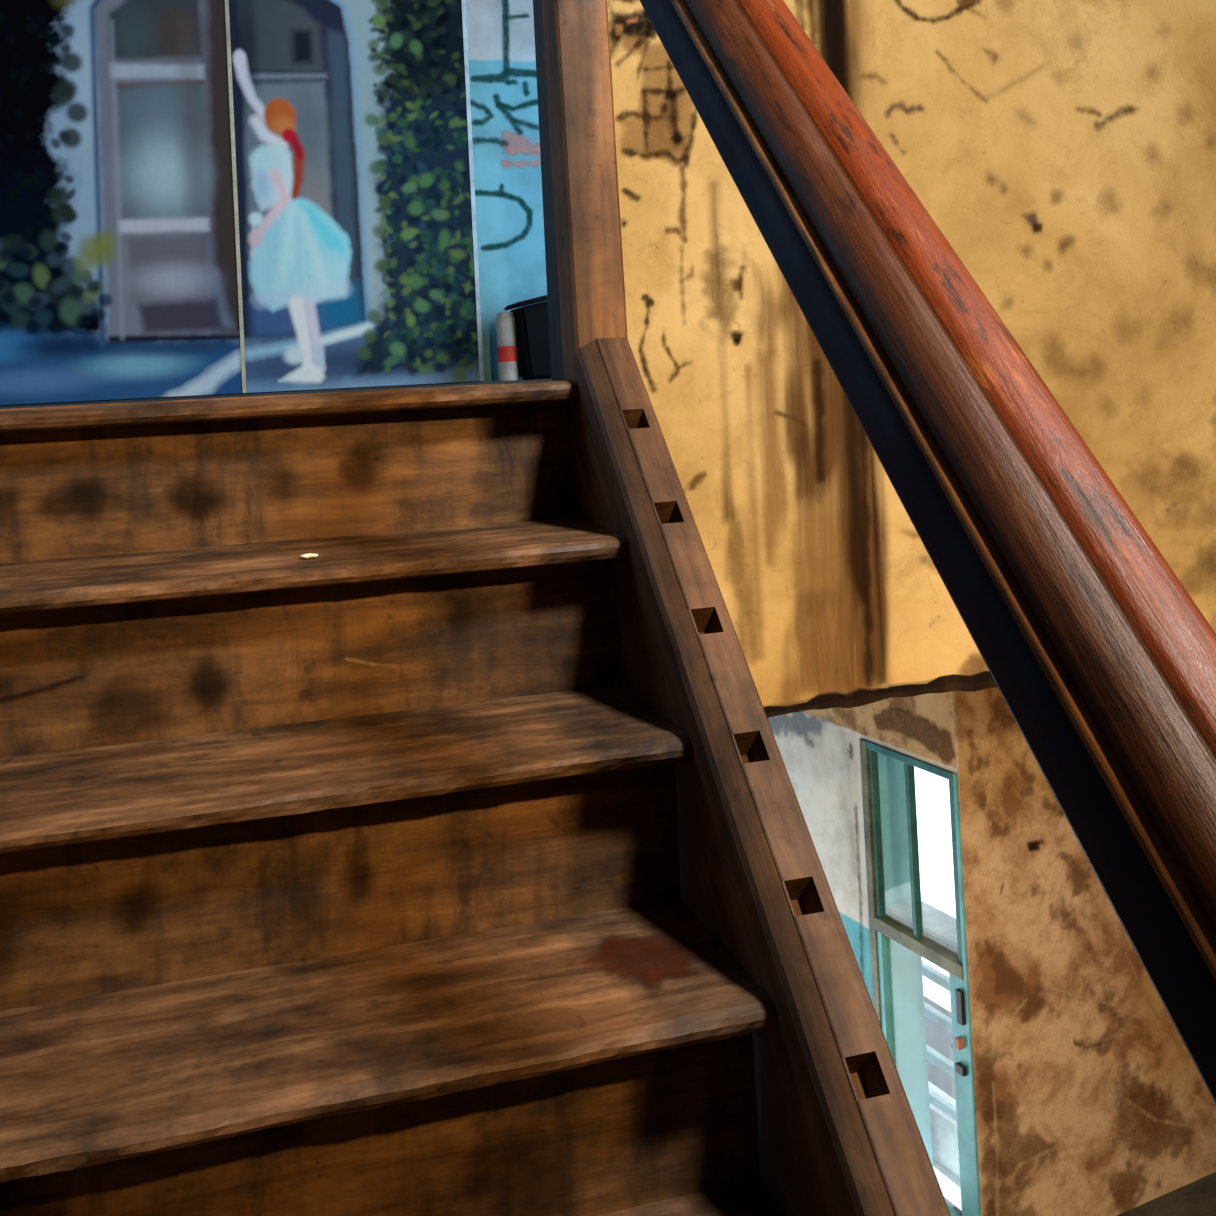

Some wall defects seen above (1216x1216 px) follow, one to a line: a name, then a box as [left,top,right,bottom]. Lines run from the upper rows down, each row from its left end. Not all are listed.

damp [797,0,858,102]
damp [761,288,887,735]